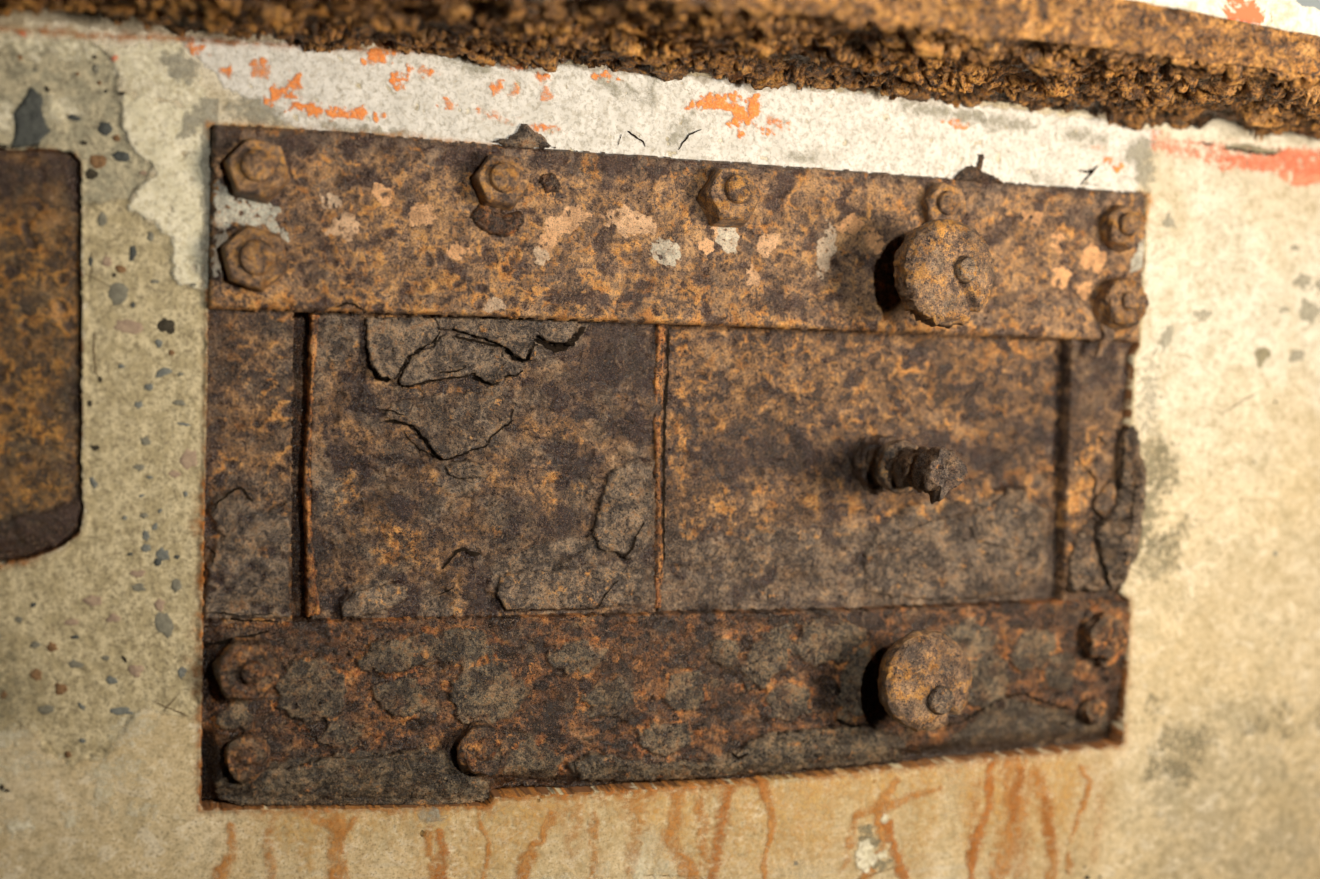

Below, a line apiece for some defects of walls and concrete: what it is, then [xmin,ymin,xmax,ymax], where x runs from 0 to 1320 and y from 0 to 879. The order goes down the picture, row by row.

peeling [1204,144,1320,187]
crack [365,327,586,461]
rust [365,316,589,480]
spalling [0,30,1206,766]
flaking render [1255,347,1271,368]
flaking render [1290,350,1305,362]
flaking render [1280,274,1320,324]
rust [340,583,408,618]
rust [496,461,654,611]
rust [862,488,1050,601]
rust [198,725,941,879]
rust [953,754,1074,879]